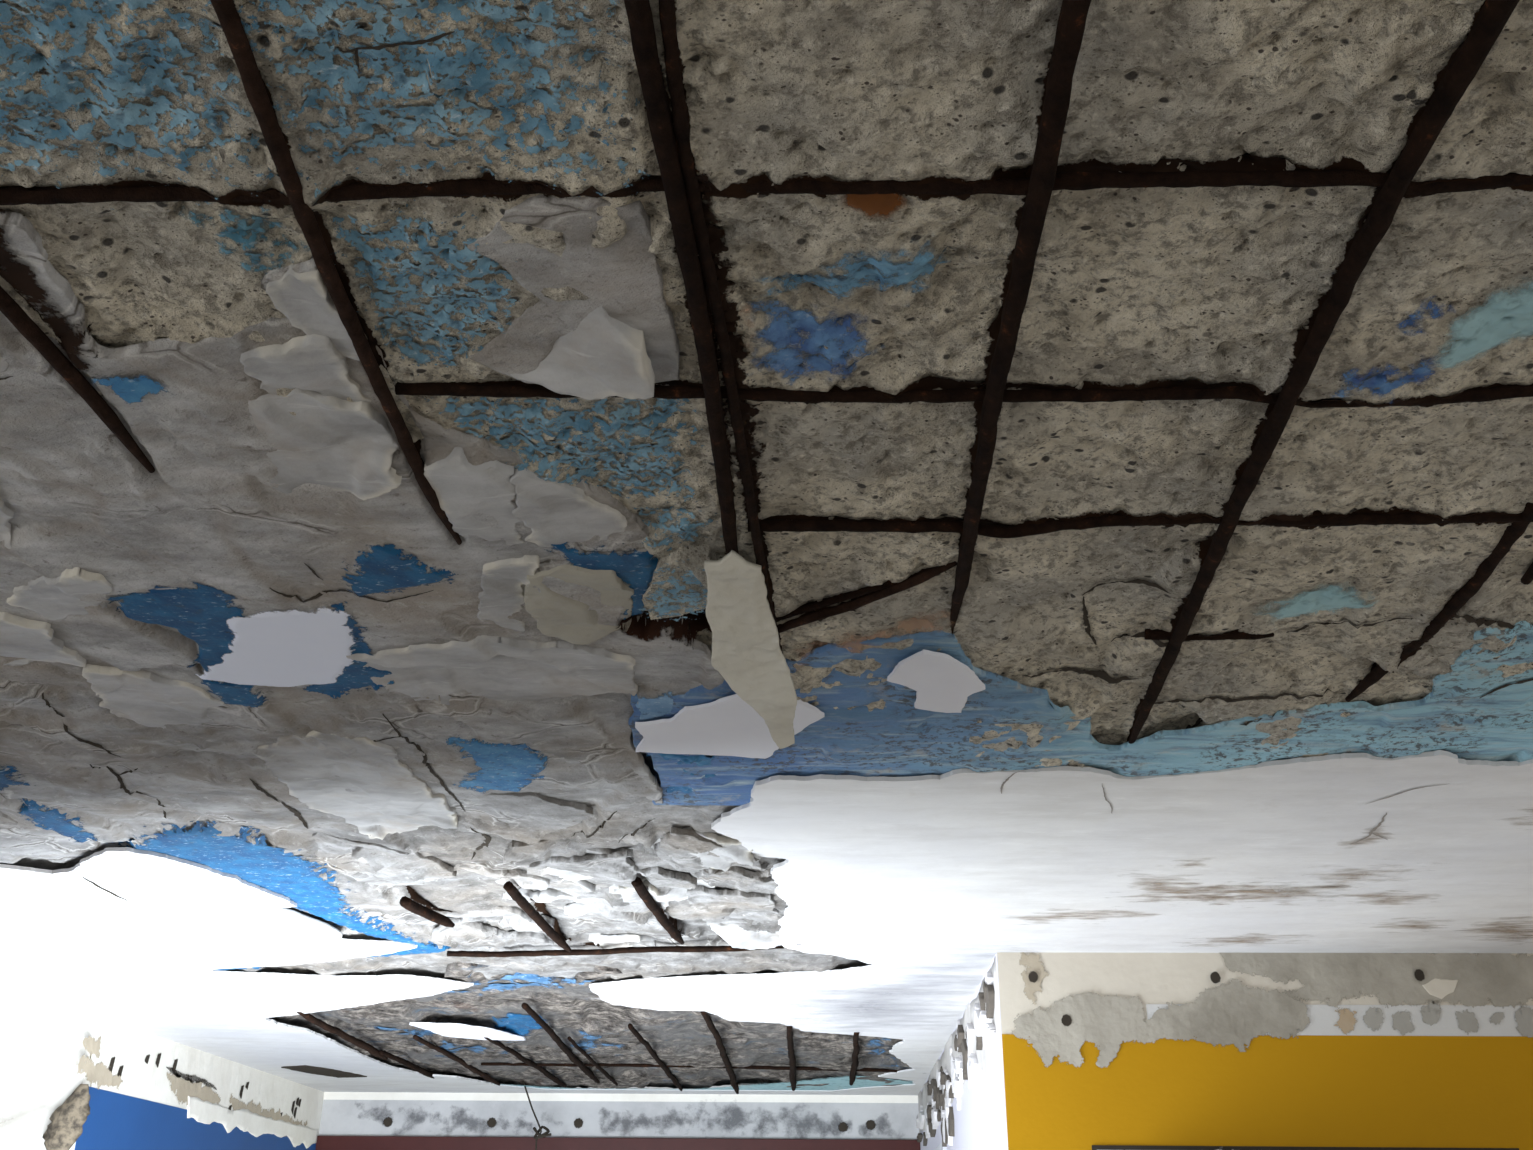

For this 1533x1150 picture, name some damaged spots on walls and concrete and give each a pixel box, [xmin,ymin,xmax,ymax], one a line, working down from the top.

corrosion [0,209,108,379]
corrosion [695,173,766,491]
corrosion [616,608,712,649]
crack [1024,579,1333,729]
crack [42,692,166,818]
crack [250,779,308,829]
crack [373,714,491,860]
leakage [1149,874,1366,898]
peeling [145,1053,318,1149]
spalling [269,962,913,1094]
peeling [916,956,1000,1147]
peeling [1012,952,1533,1068]